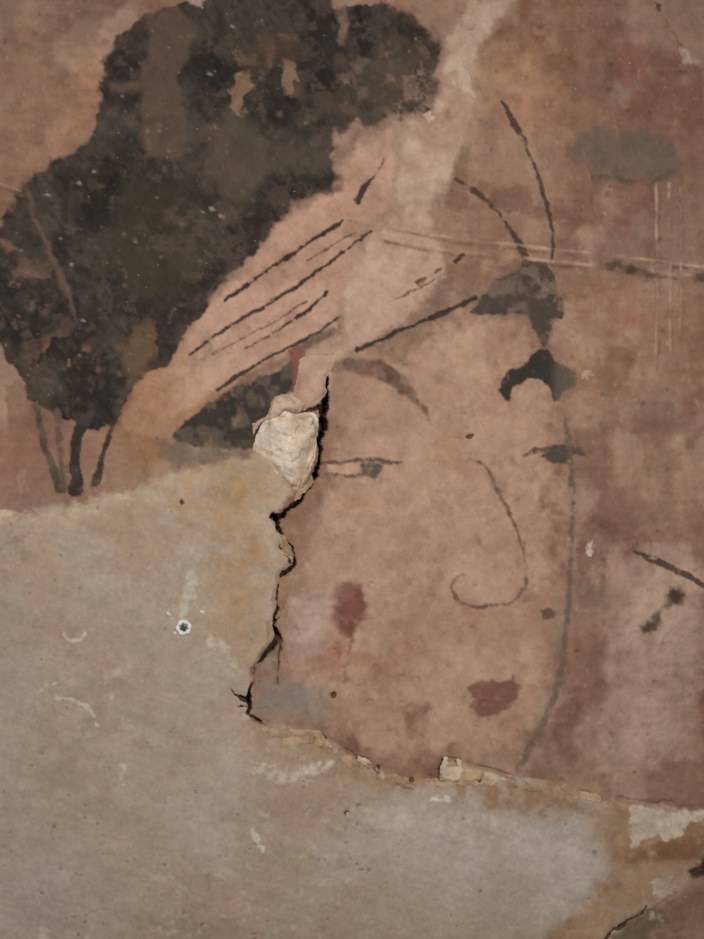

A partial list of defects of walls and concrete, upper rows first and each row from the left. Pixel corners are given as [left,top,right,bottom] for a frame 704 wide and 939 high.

spalling [0,508,28,530]
crack [230,376,329,725]
spalling [584,539,596,558]
spalling [635,541,672,565]
spalling [260,723,545,792]
spalling [626,802,704,850]
crack [604,906,647,939]